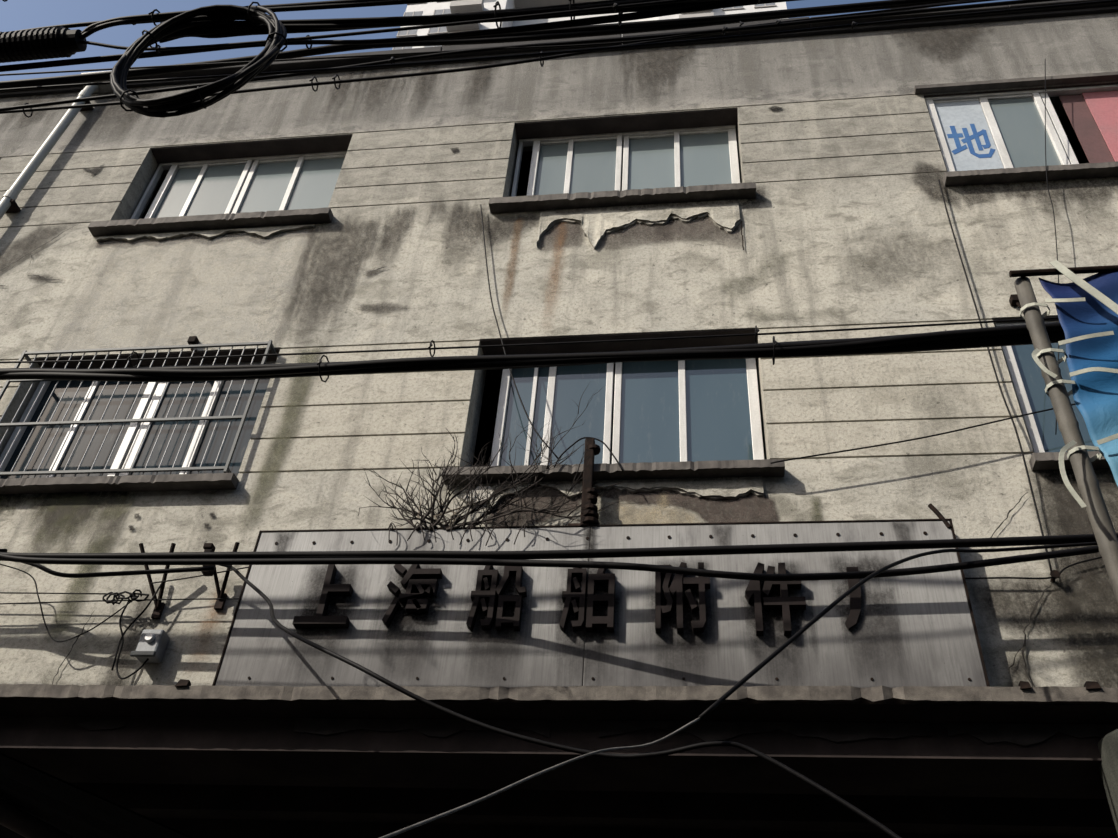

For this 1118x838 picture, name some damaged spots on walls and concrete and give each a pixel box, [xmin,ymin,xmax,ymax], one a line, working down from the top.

leakage [330,69,396,103]
leakage [621,44,694,86]
leakage [915,164,1118,206]
peeling [96,225,315,247]
leakage [433,205,483,245]
peeling [537,201,744,250]
leakage [290,211,412,319]
peeling [461,477,779,526]
leakage [0,492,135,633]
crack [1009,582,1052,687]